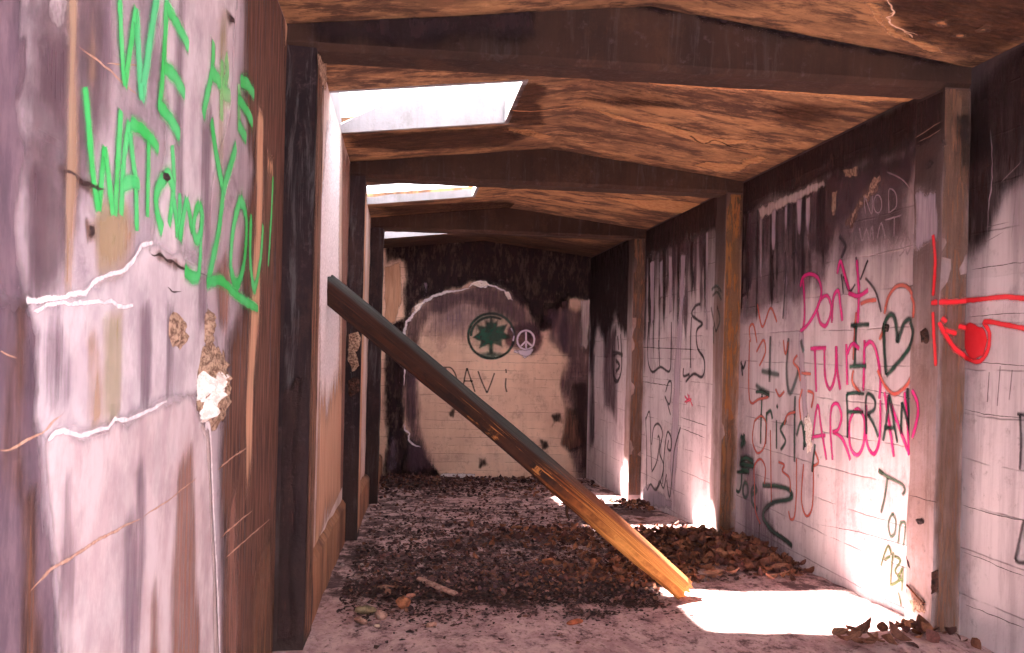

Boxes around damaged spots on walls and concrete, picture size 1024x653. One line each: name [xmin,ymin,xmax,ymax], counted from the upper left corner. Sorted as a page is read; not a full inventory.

crack [886,0,917,38]
spalling [348,332,361,397]
water stain [315,83,765,545]
water stain [741,181,825,314]
flaking render [24,240,233,653]